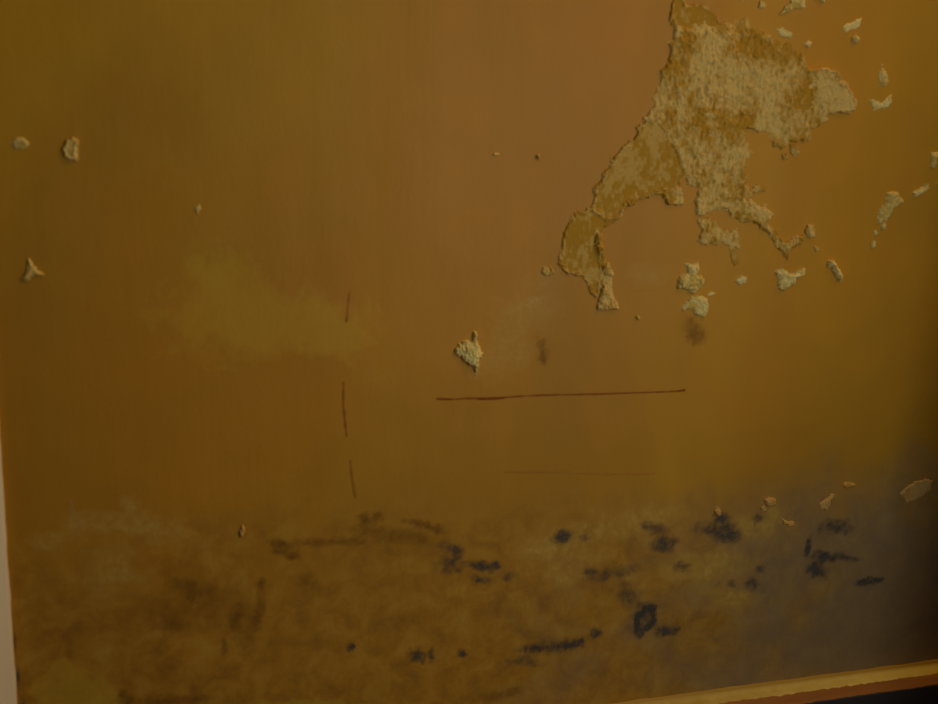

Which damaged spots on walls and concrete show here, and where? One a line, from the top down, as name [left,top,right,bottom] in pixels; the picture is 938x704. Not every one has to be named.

peeling [842,17,862,44]
peeling [868,64,892,111]
peeling [62,137,79,161]
peeling [541,0,858,318]
peeling [870,181,938,248]
peeling [21,258,44,281]
peeling [453,331,483,375]
crack [437,389,685,400]
water stain [20,492,206,606]
water stain [514,501,800,616]
water stain [635,605,678,637]